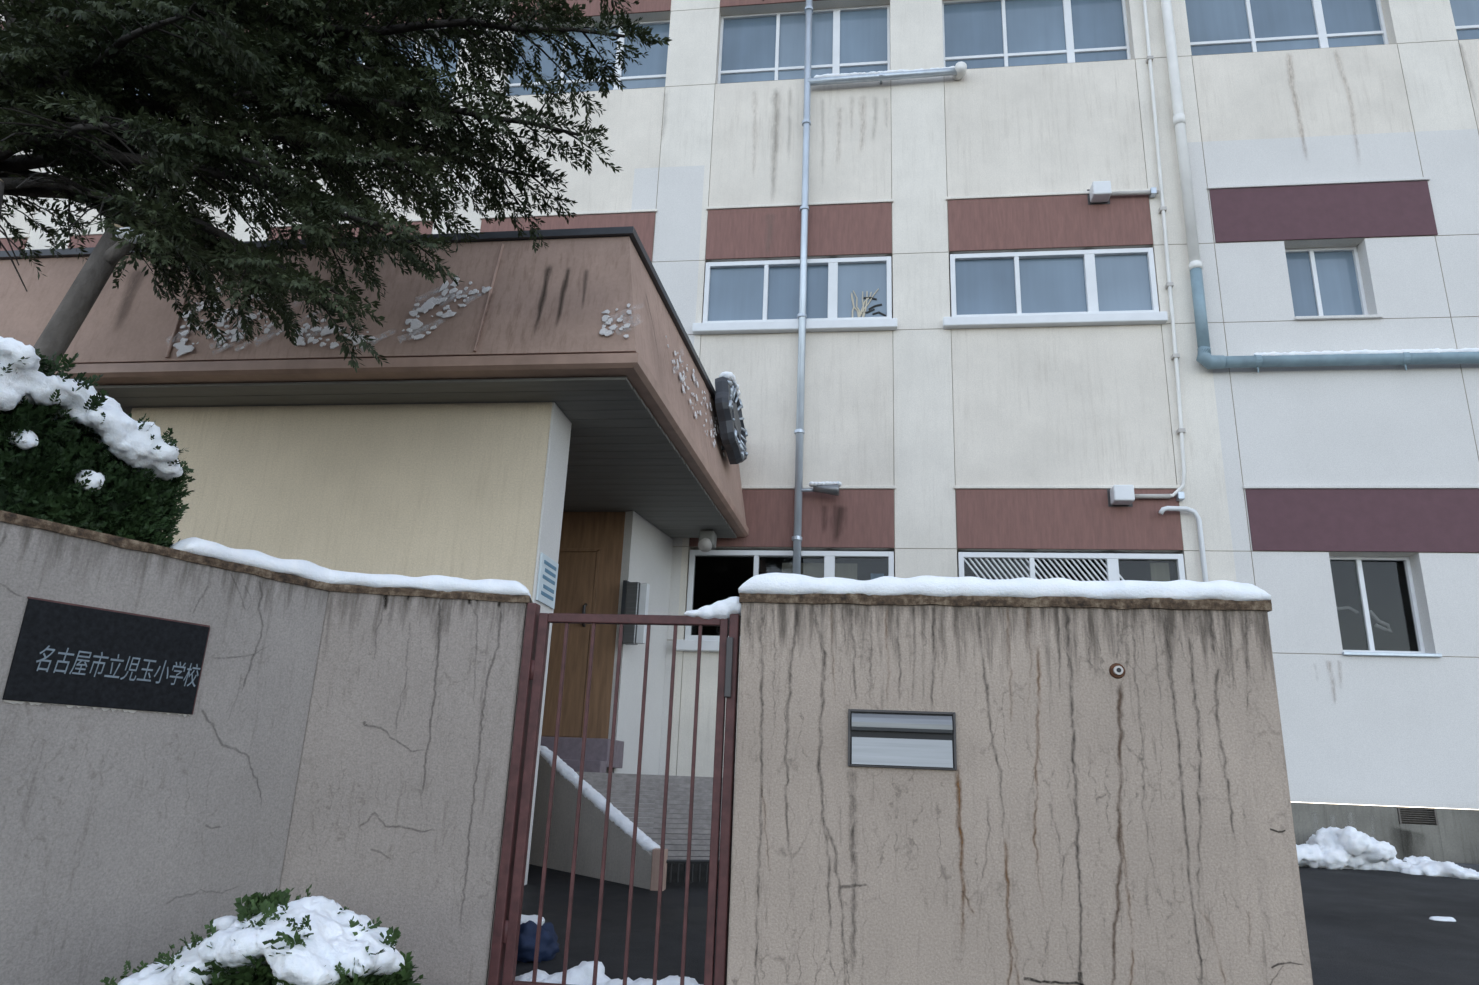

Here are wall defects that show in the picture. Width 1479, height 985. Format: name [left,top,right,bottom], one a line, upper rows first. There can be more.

peeling [173,282,382,357]
peeling [400,277,492,340]
water stain [537,268,569,322]
peeling [599,303,631,338]
peeling [666,336,725,456]
crack [1024,972,1084,985]